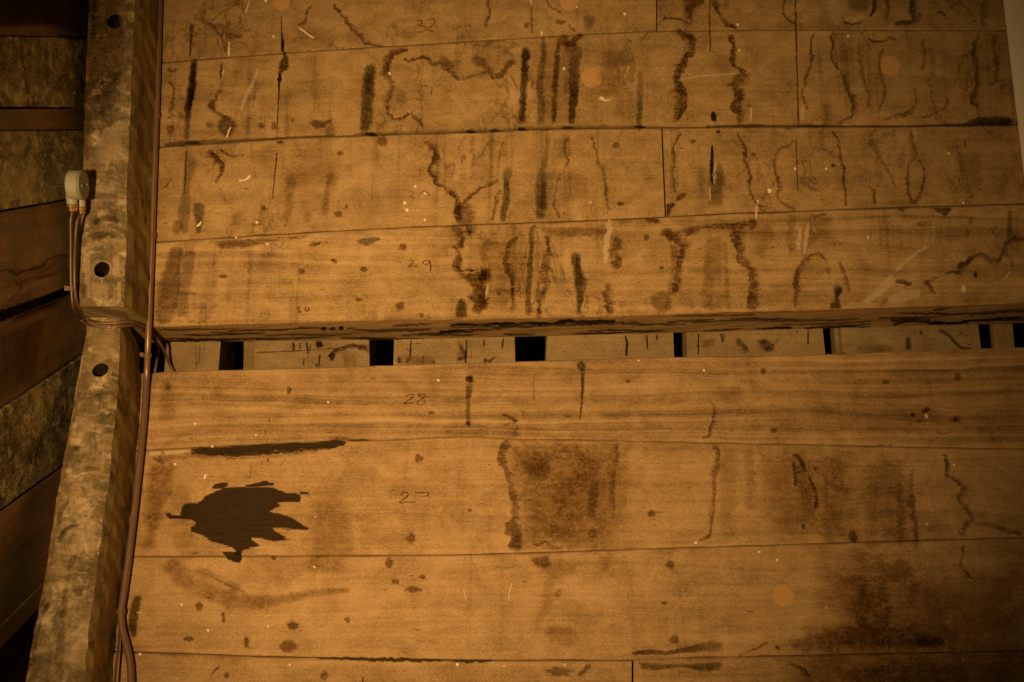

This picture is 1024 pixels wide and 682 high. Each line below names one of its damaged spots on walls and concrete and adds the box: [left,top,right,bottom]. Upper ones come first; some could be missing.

leakage [185,25,197,121]
leakage [505,50,529,121]
leakage [552,35,582,120]
leakage [572,254,586,312]
leakage [648,190,758,309]